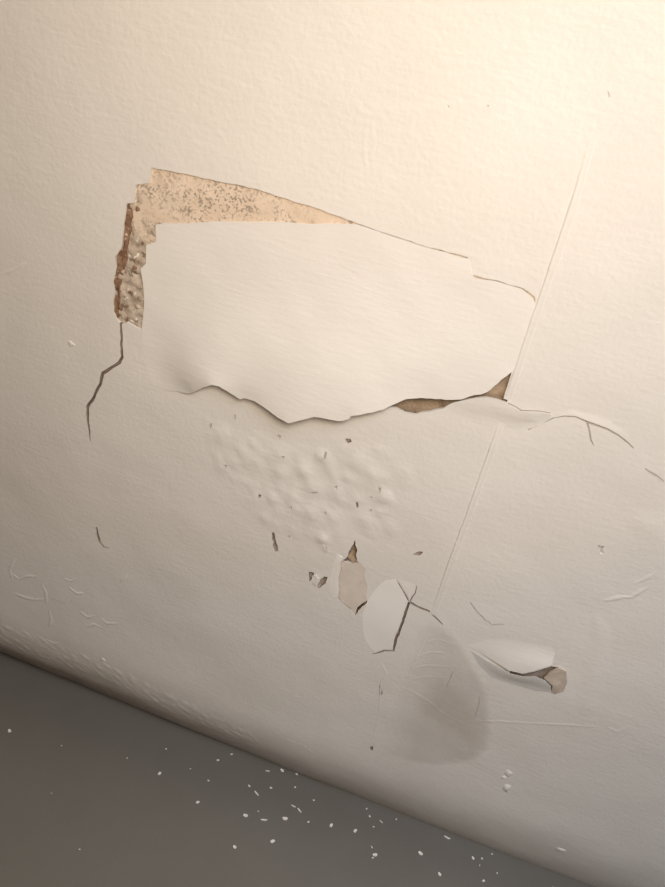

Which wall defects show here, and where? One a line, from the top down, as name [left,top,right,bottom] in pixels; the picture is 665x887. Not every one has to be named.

peeling [114,168,552,431]
crack [86,322,124,441]
crack [508,403,633,448]
crack [644,468,664,482]
peeling [309,541,415,652]
crack [470,602,504,626]
peeling [468,639,567,694]